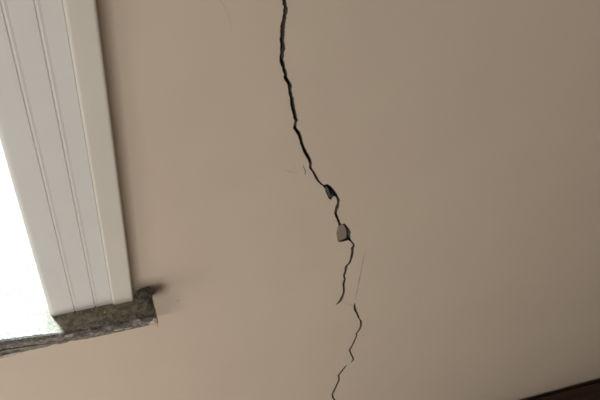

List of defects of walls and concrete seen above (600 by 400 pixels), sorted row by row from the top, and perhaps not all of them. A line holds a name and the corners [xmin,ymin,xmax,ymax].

crack [279,0,323,185]
crack [333,197,341,223]
crack [331,241,362,400]